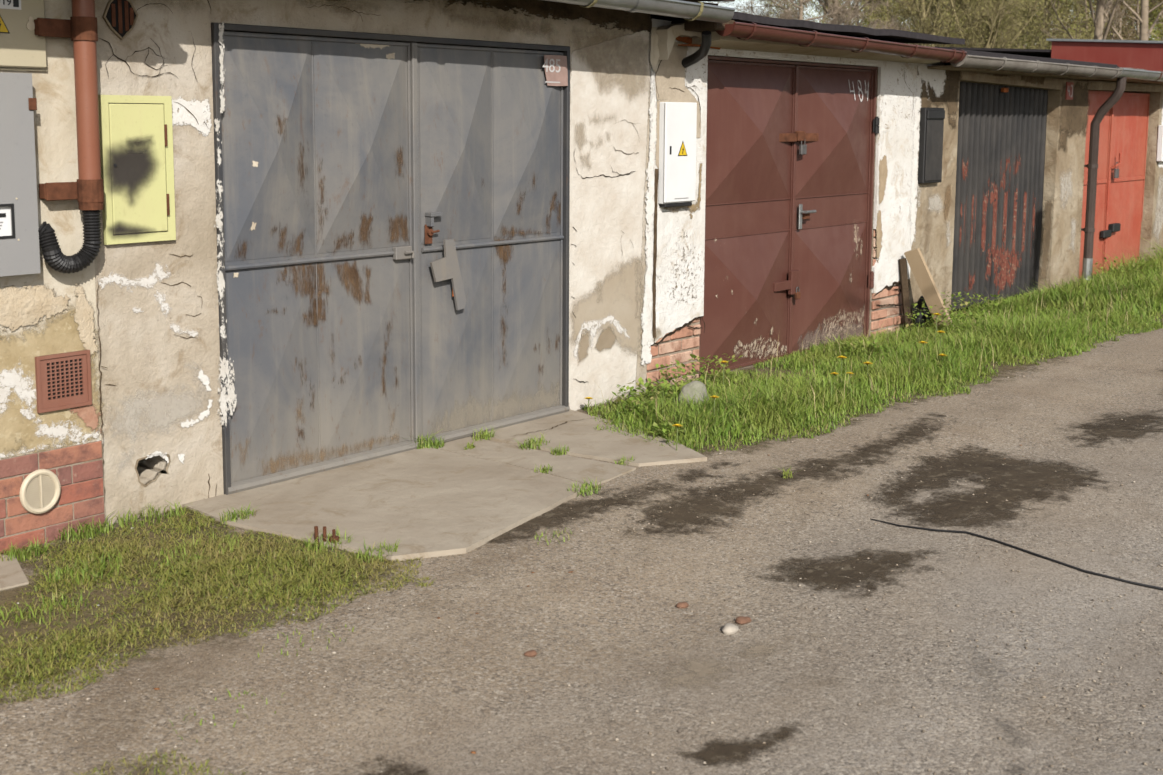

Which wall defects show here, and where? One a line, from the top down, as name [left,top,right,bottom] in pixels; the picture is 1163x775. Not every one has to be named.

peeling [172,22,226,165]
damp [576,36,647,95]
peeling [214,179,239,426]
rust [273,216,373,326]
rust [389,215,408,241]
rust [496,194,561,263]
damp [571,259,643,361]
peeling [641,42,701,367]
peeling [0,282,104,460]
spalling [135,451,185,487]